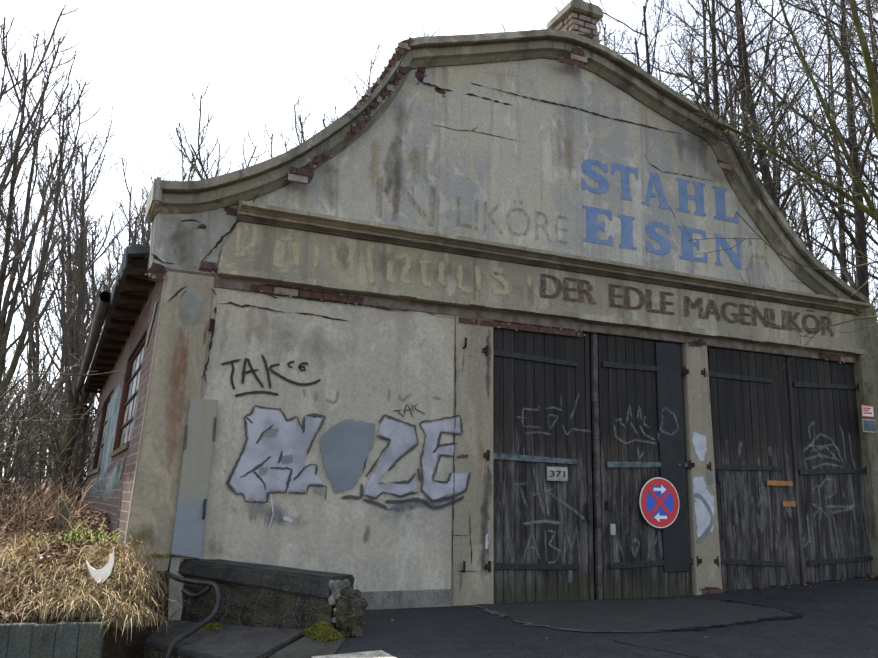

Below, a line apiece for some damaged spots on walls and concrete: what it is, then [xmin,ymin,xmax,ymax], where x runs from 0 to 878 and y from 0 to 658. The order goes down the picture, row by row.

spalling [344,37,429,140]
crack [422,82,691,136]
crack [432,125,524,143]
spalling [284,150,334,184]
crack [645,156,716,182]
crack [145,254,174,265]
crack [199,220,238,266]
crack [167,286,190,302]
crack [201,289,477,590]